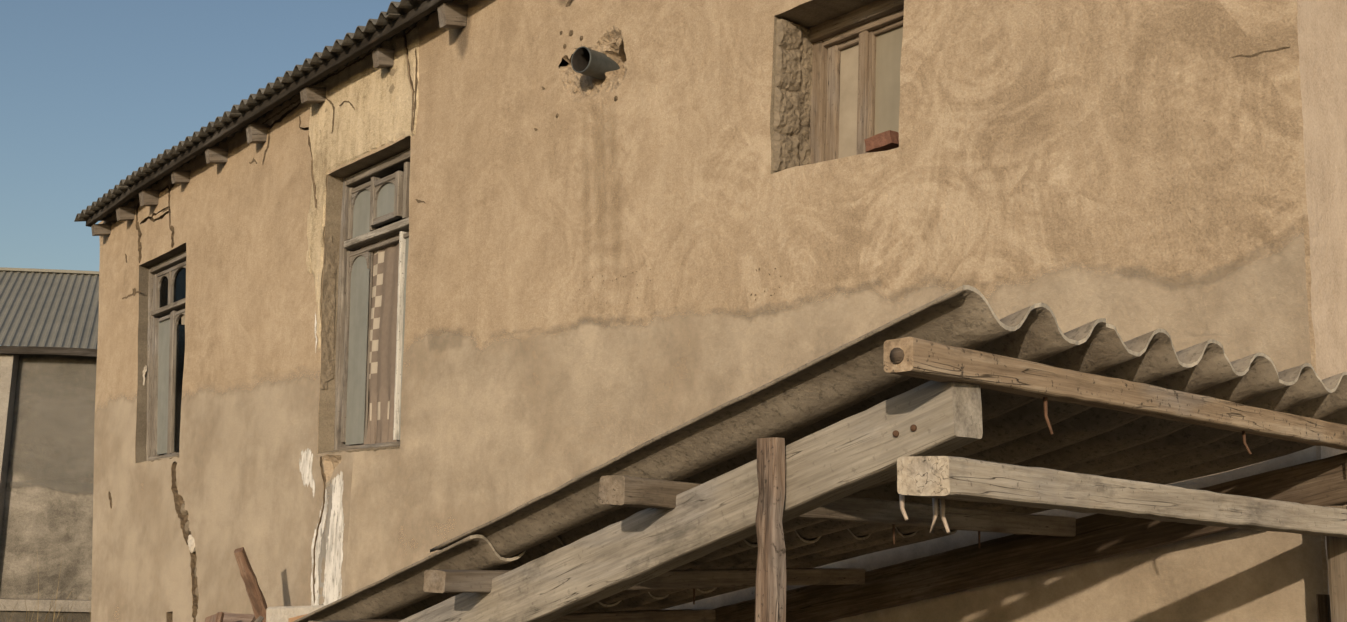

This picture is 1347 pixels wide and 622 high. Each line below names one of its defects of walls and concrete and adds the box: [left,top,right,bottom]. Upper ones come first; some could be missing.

crack [249,25,417,208]
spalling [559,26,628,103]
crack [106,183,175,299]
peeling [299,449,341,498]
crack [171,463,199,622]